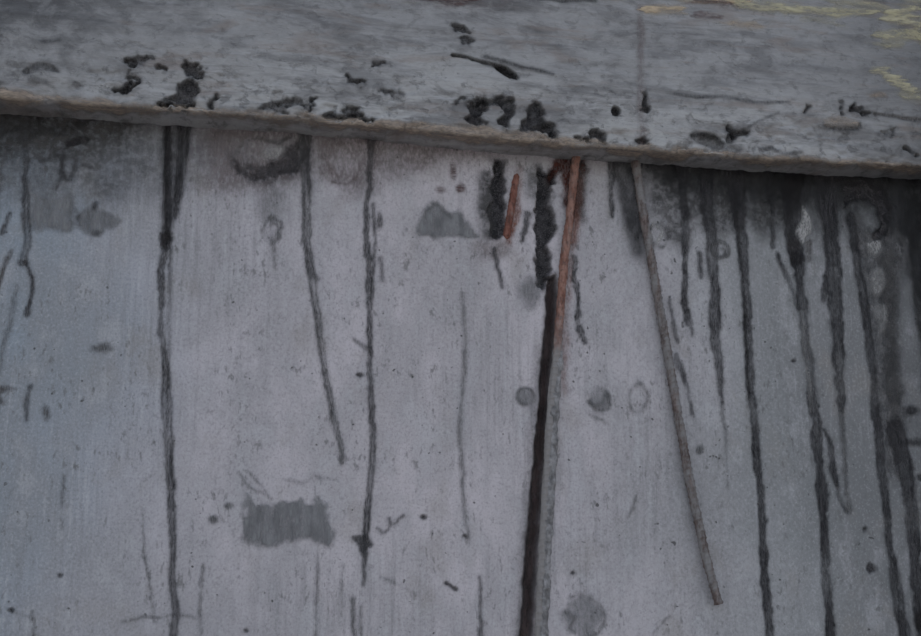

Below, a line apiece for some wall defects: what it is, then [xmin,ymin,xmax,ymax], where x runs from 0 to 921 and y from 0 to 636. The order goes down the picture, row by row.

rust [548,159,587,242]
damp [608,162,642,254]
crack [572,255,587,344]
spalling [631,160,723,605]
damp [642,163,921,636]